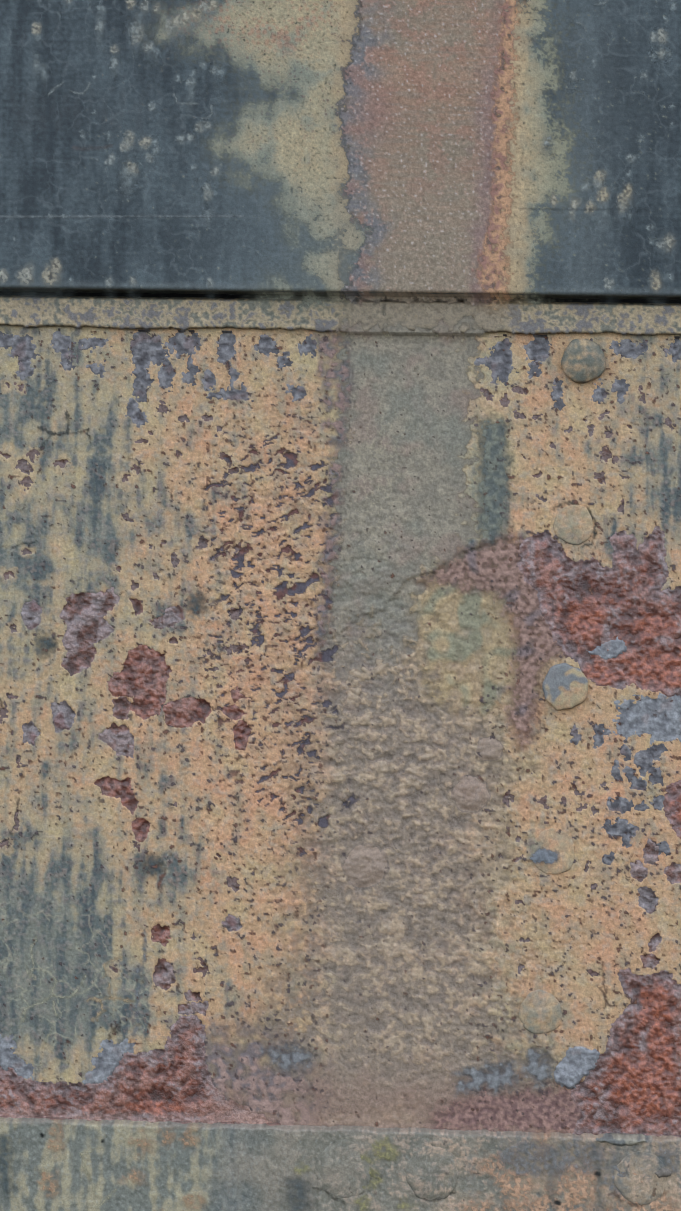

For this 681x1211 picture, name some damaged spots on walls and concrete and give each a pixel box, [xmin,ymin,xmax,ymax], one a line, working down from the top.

peeling [126,0,370,307]
rust [337,0,520,306]
water stain [36,637,56,652]
peeling [0,328,368,1115]
rust [0,312,681,1160]
rust [482,1155,600,1211]